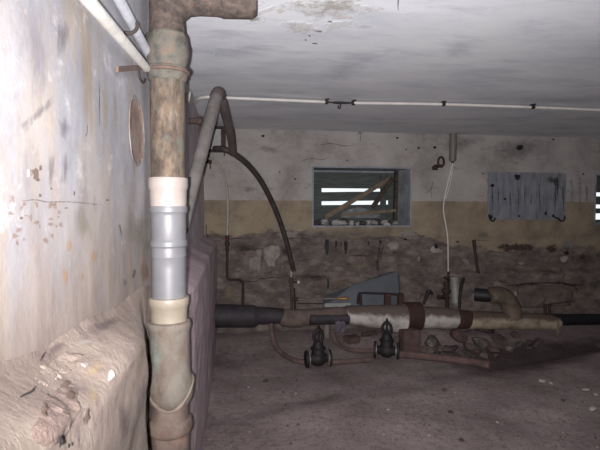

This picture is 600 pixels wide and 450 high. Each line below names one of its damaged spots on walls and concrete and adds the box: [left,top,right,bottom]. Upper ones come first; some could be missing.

peeling [287,1,385,44]
peeling [27,165,42,181]
peeling [249,245,286,271]
spalling [30,381,89,448]